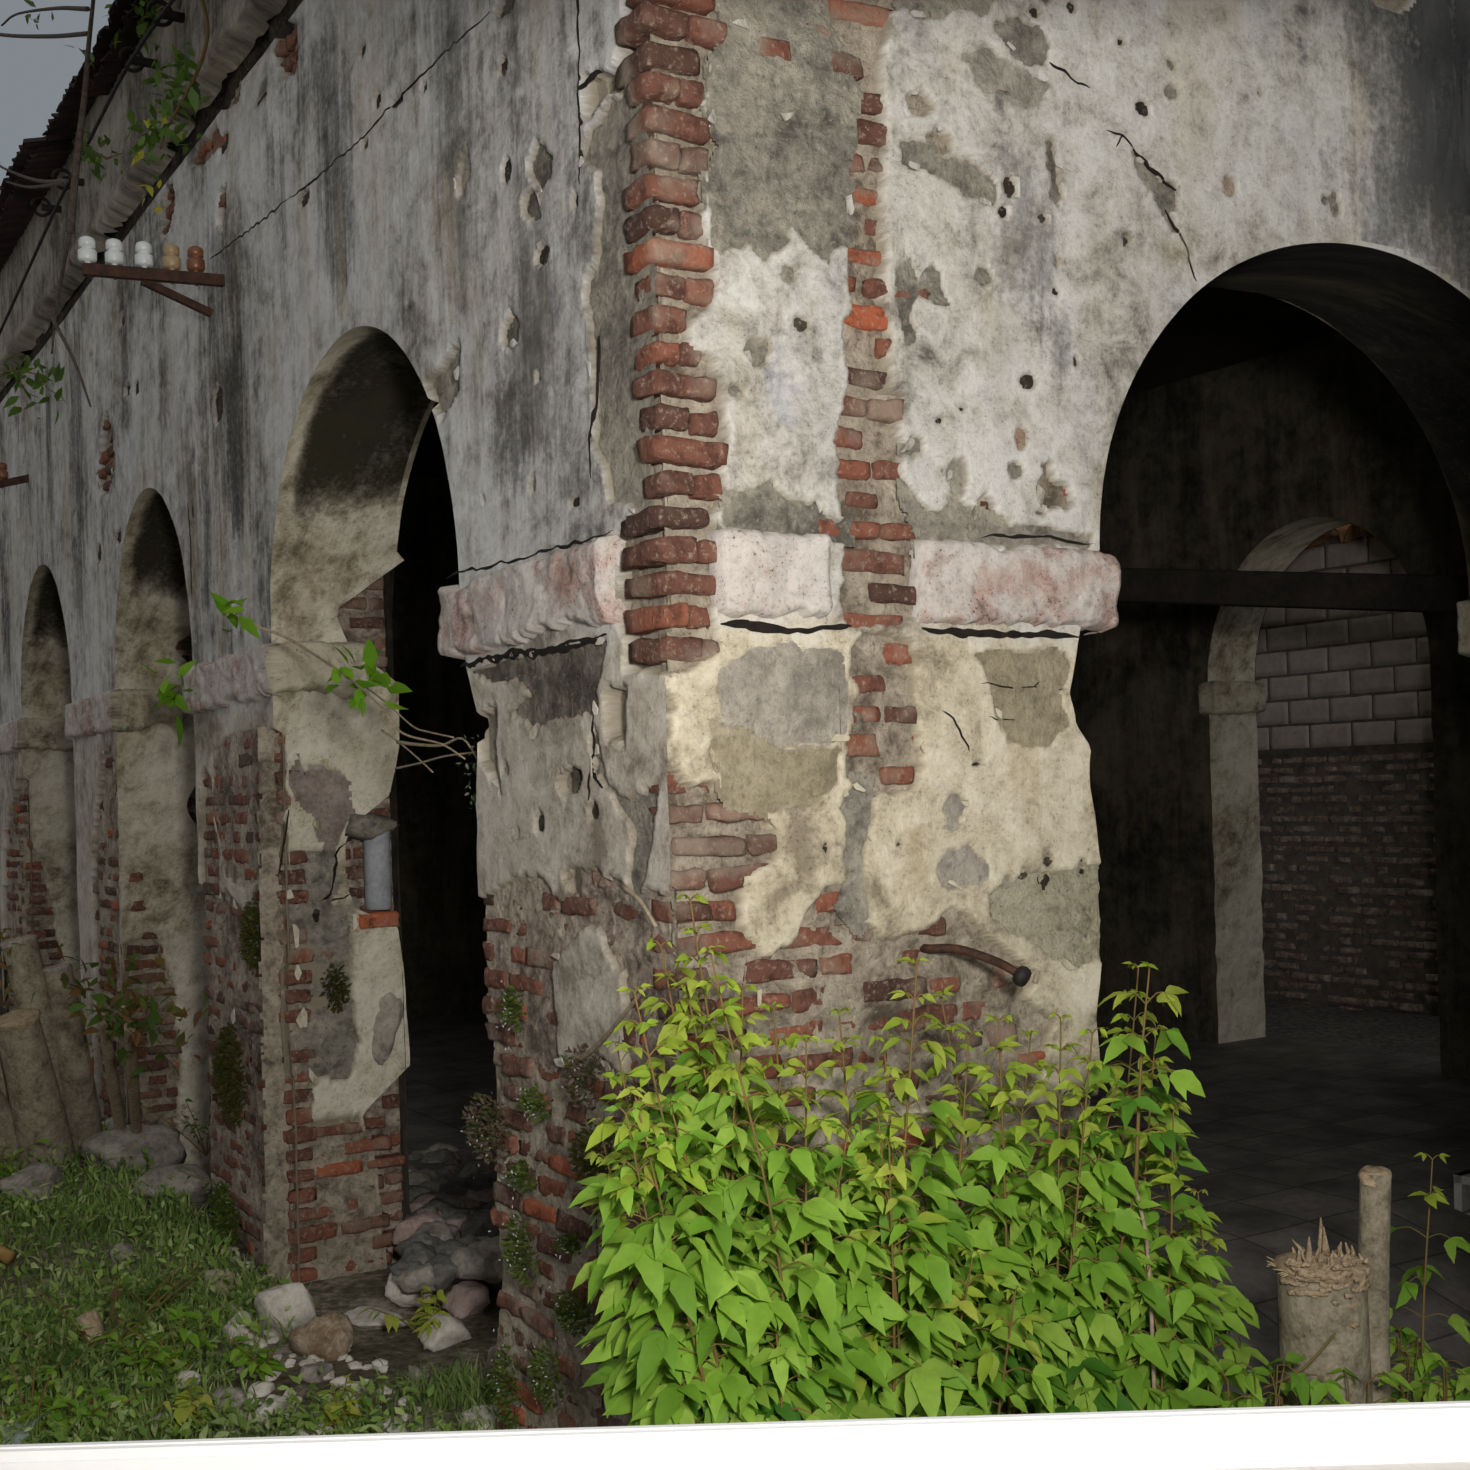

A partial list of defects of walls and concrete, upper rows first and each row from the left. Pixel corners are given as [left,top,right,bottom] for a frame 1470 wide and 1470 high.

crack [210,11,490,259]
crack [1107,130,1197,282]
water stain [1345,0,1470,284]
flaking render [337,576,388,673]
crack [446,530,613,579]
crack [460,633,607,668]
crack [720,619,852,635]
peeling [473,0,1100,1430]
crack [982,533,1095,545]
flaking render [6,763,78,967]
flaking render [91,746,182,1128]
flaking render [187,725,406,1287]